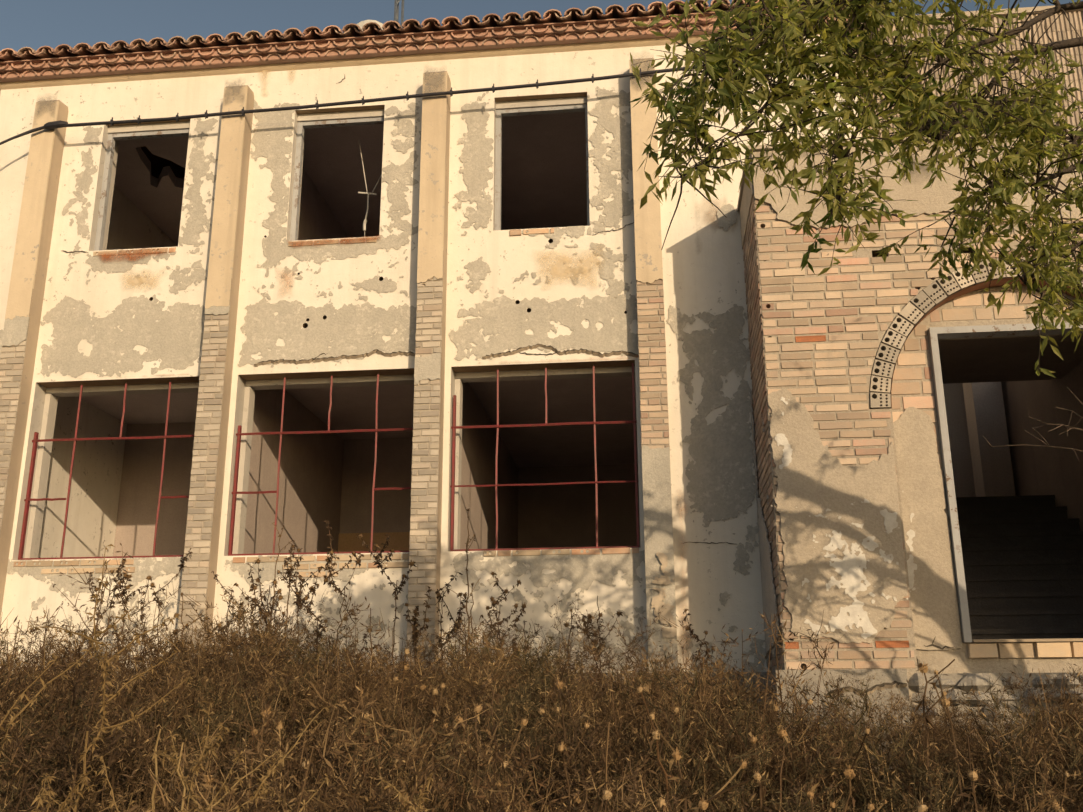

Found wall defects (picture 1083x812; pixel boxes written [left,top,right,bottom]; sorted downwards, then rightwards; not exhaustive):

spalling [0,330,27,532]
crack [254,349,415,367]
peeling [7,86,1083,684]
crack [482,344,639,359]